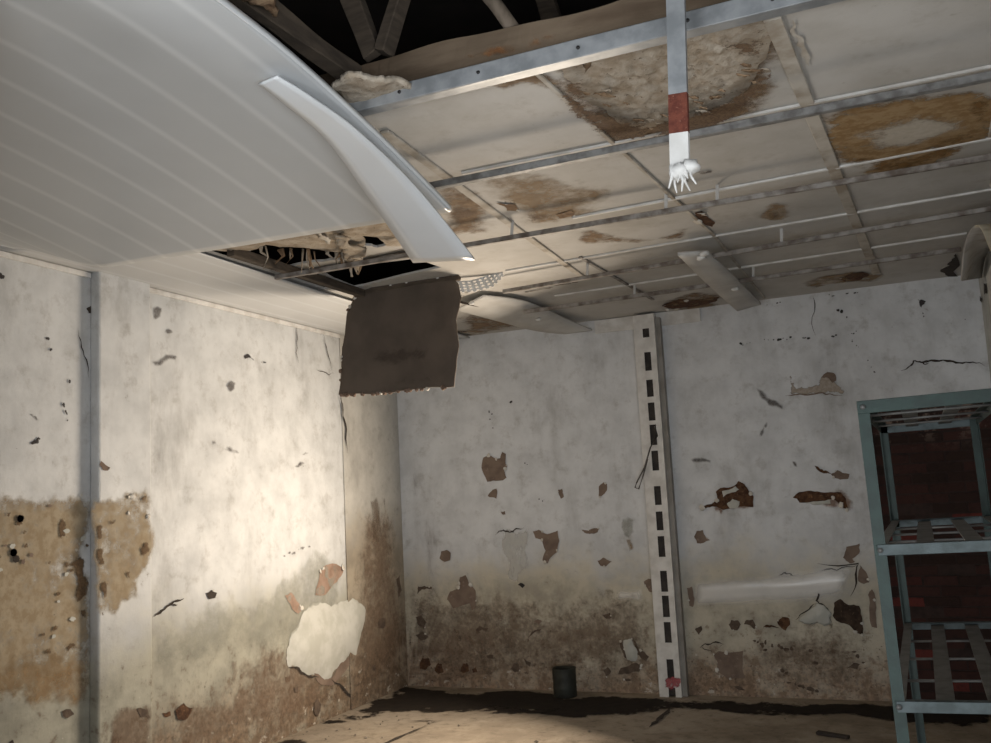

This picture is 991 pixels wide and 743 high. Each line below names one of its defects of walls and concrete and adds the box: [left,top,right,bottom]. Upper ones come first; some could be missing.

damp [826,92,991,174]
damp [445,188,484,233]
damp [493,178,602,222]
flaking render [815,466,849,480]
flaking render [699,481,754,511]
flaking render [793,491,849,512]
flaking render [533,530,559,564]
peeling [0,493,154,691]
damp [414,602,639,680]
damp [113,708,149,743]
damp [324,687,895,724]
damp [906,713,990,727]